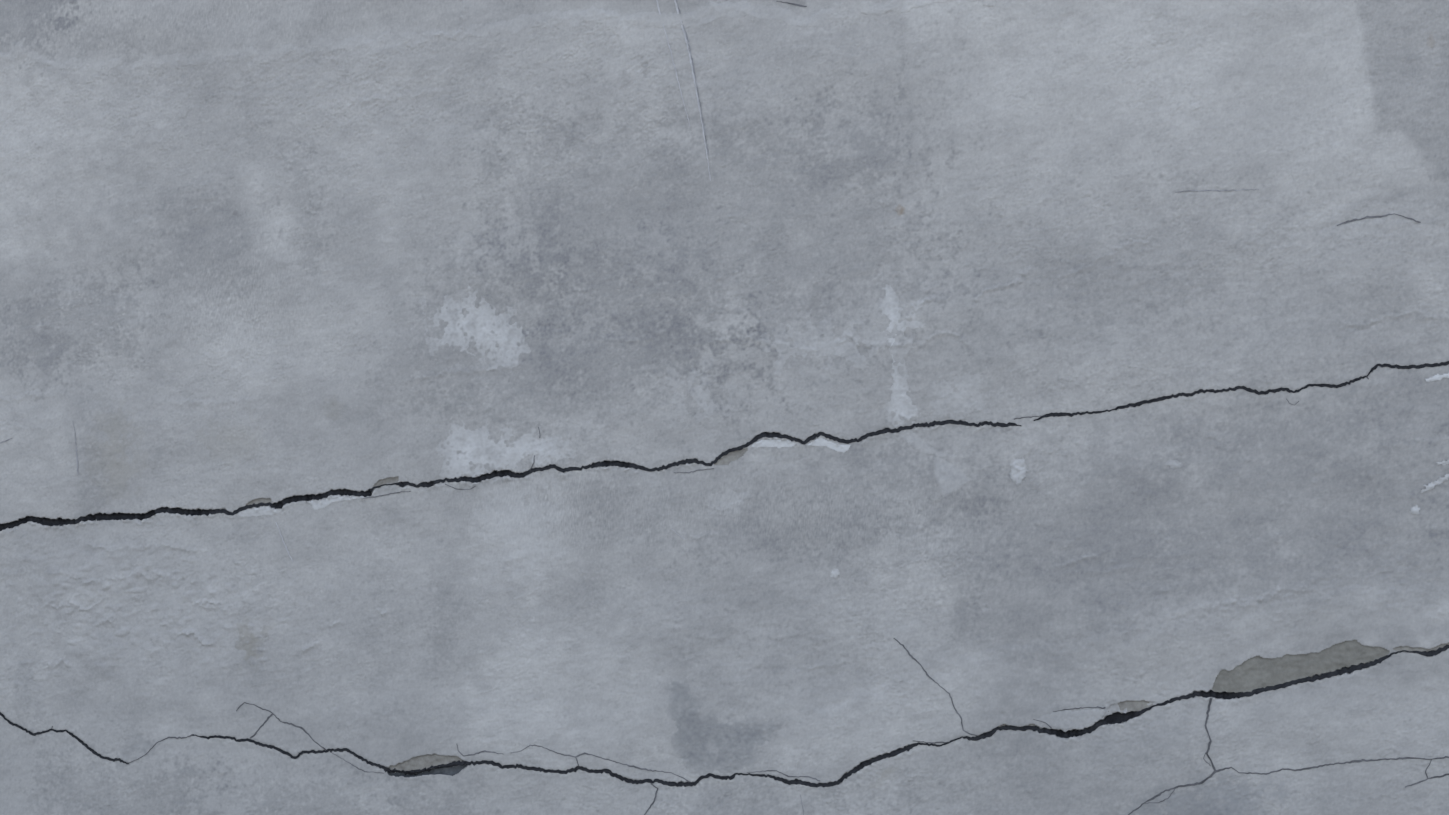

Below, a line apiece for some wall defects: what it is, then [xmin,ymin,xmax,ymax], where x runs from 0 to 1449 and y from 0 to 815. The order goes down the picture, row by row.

crack [0,361,1449,531]
crack [0,638,1449,815]
spalling [1212,640,1449,693]